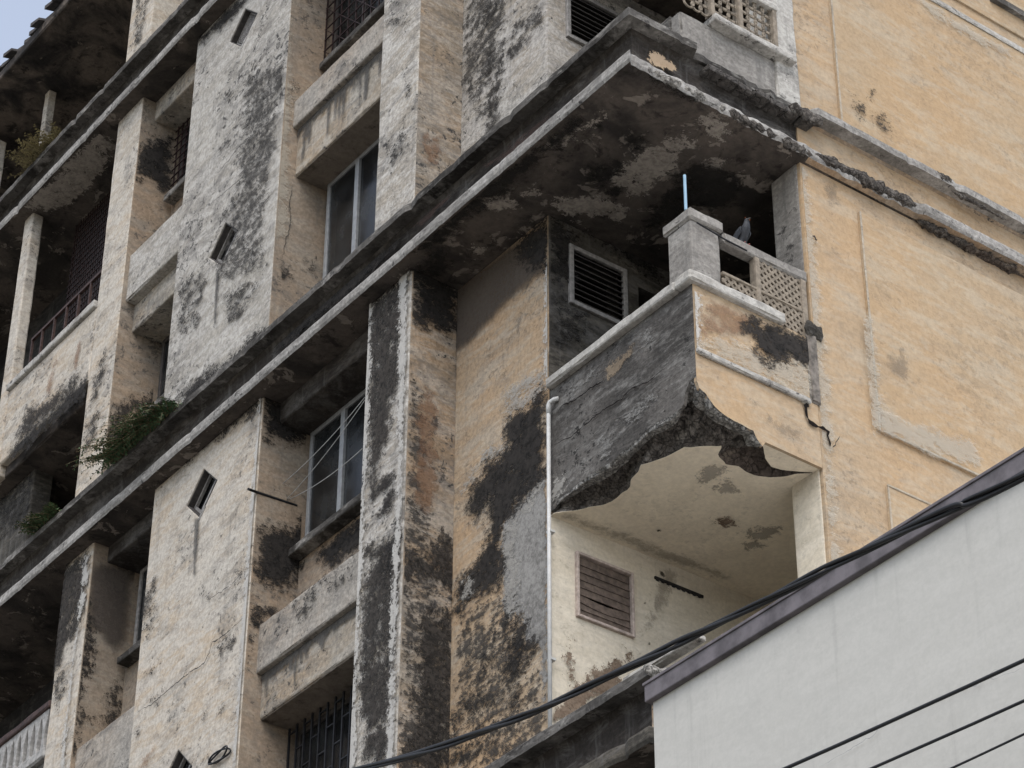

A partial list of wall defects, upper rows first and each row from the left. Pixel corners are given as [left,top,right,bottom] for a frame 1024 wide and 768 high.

peeling [482,50,917,230]
water stain [172,58,300,344]
spalling [937,171,1006,220]
spalling [917,220,1021,275]
mould [739,314,809,370]
water stain [216,115,583,768]
crack [804,403,840,447]
spalling [497,376,812,620]
water stain [743,526,783,551]